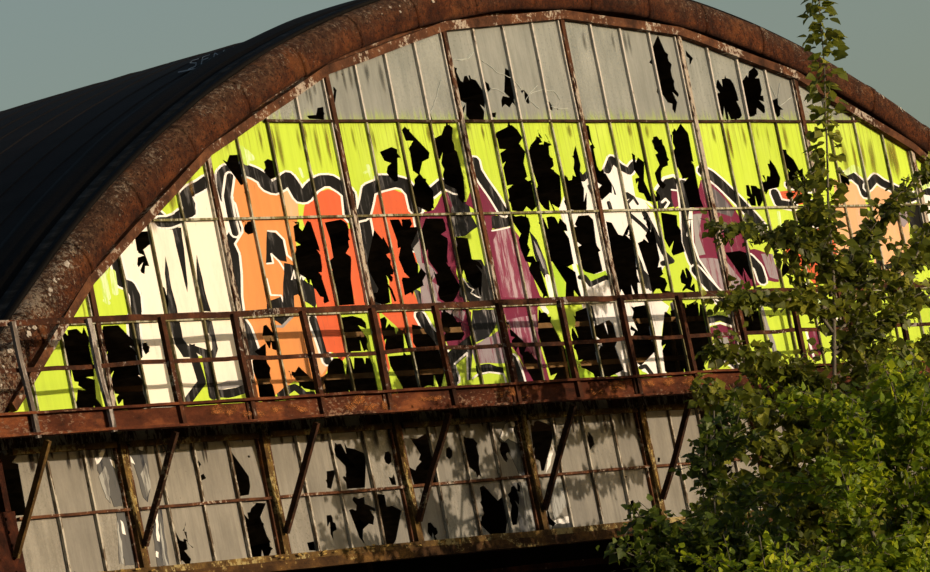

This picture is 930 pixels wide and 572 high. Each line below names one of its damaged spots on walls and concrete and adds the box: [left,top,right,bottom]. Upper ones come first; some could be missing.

corrosion [348,396,386,410]